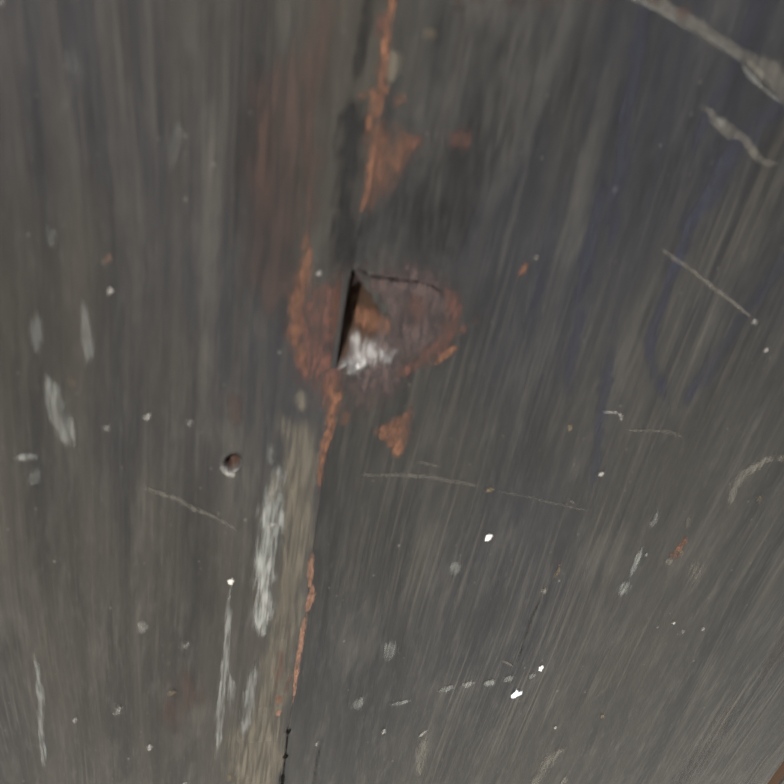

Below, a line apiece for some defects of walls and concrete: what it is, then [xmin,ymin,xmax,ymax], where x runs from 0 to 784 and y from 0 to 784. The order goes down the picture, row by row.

corrosion [291,250,342,483]
crack [280,729,291,784]